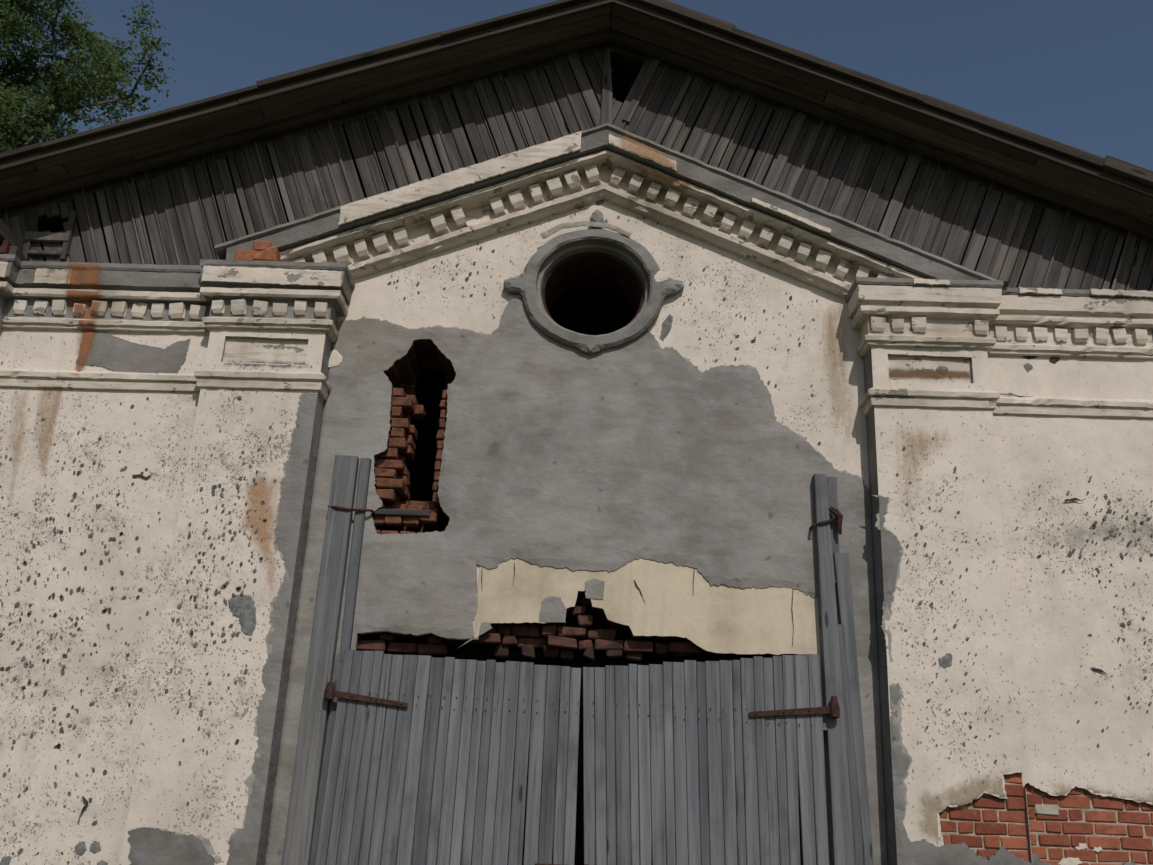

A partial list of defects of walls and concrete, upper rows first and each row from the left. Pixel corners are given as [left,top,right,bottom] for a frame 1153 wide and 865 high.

corrosion [66,263,103,372]
peeling [328,350,342,368]
spalling [34,485,141,569]
spalling [0,533,98,698]
spalling [100,586,143,656]
spalling [357,634,451,658]
peeling [470,558,821,669]
spalling [42,666,126,749]
spalling [0,832,39,865]
flaking render [937,771,1153,865]